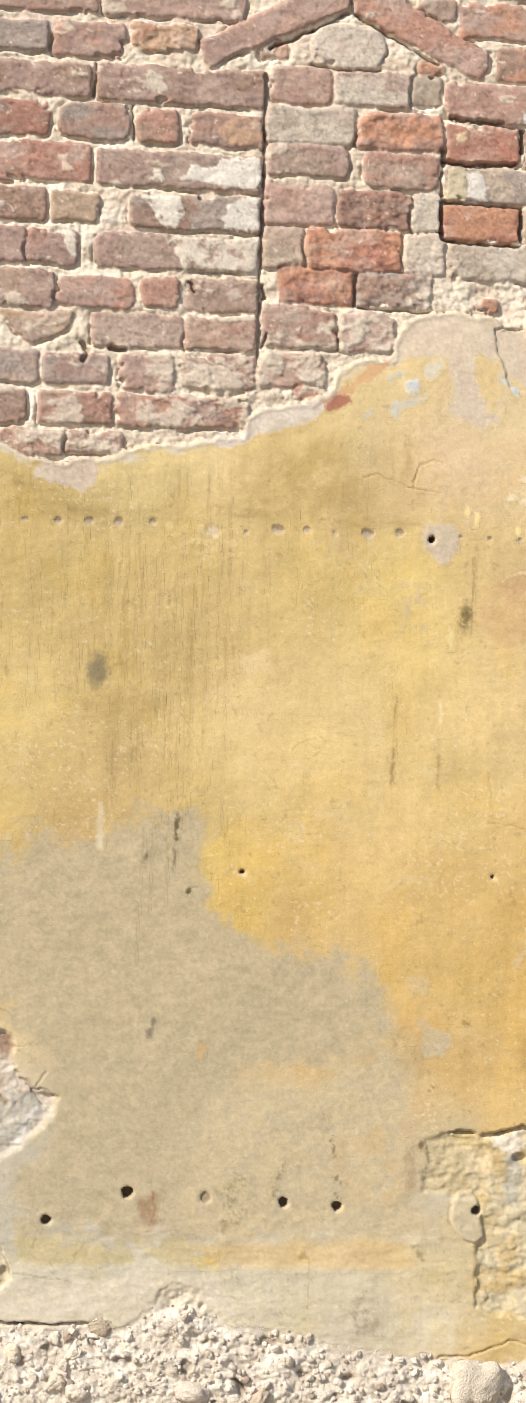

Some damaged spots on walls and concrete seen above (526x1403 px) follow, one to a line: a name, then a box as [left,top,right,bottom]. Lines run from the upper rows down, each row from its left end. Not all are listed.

peeling [199,304,526,451]
peeling [32,454,101,496]
leakage [0,415,430,967]
peeling [0,765,526,1320]
spalling [0,1256,458,1403]
spalling [497,1363,526,1403]